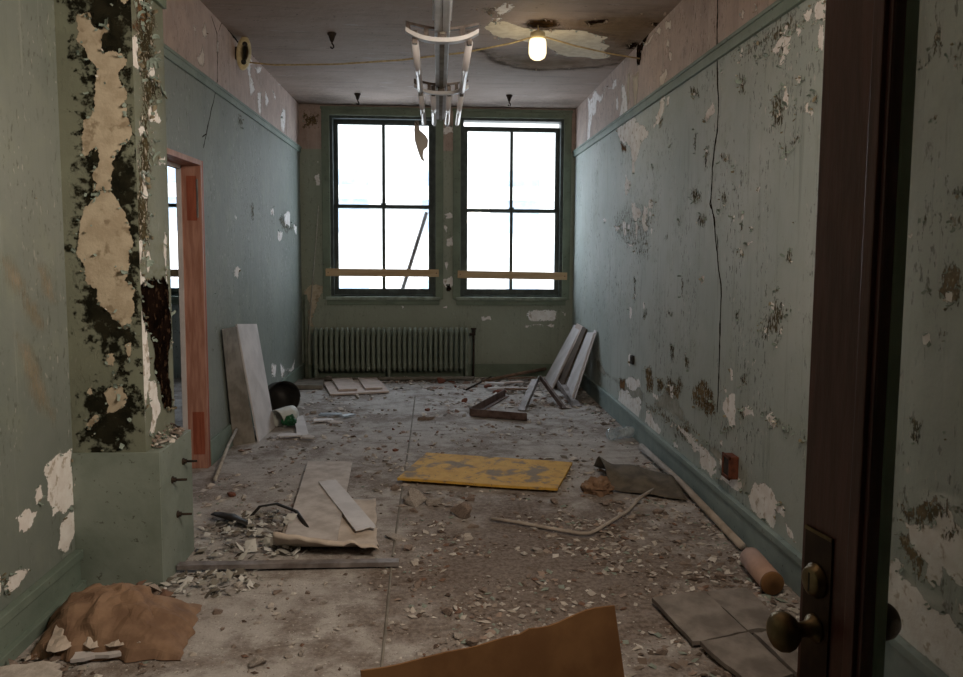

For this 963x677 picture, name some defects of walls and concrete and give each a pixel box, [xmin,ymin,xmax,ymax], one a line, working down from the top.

damp [479,50,578,71]
peeling [484,3,611,59]
peeling [735,0,826,69]
peeling [587,17,672,253]
peeling [770,77,818,161]
peeling [70,12,177,437]
crack [709,0,722,411]
peeling [525,310,566,328]
peeling [16,448,75,552]
peeling [616,354,796,543]
peeling [0,566,31,596]
peeling [888,496,963,677]